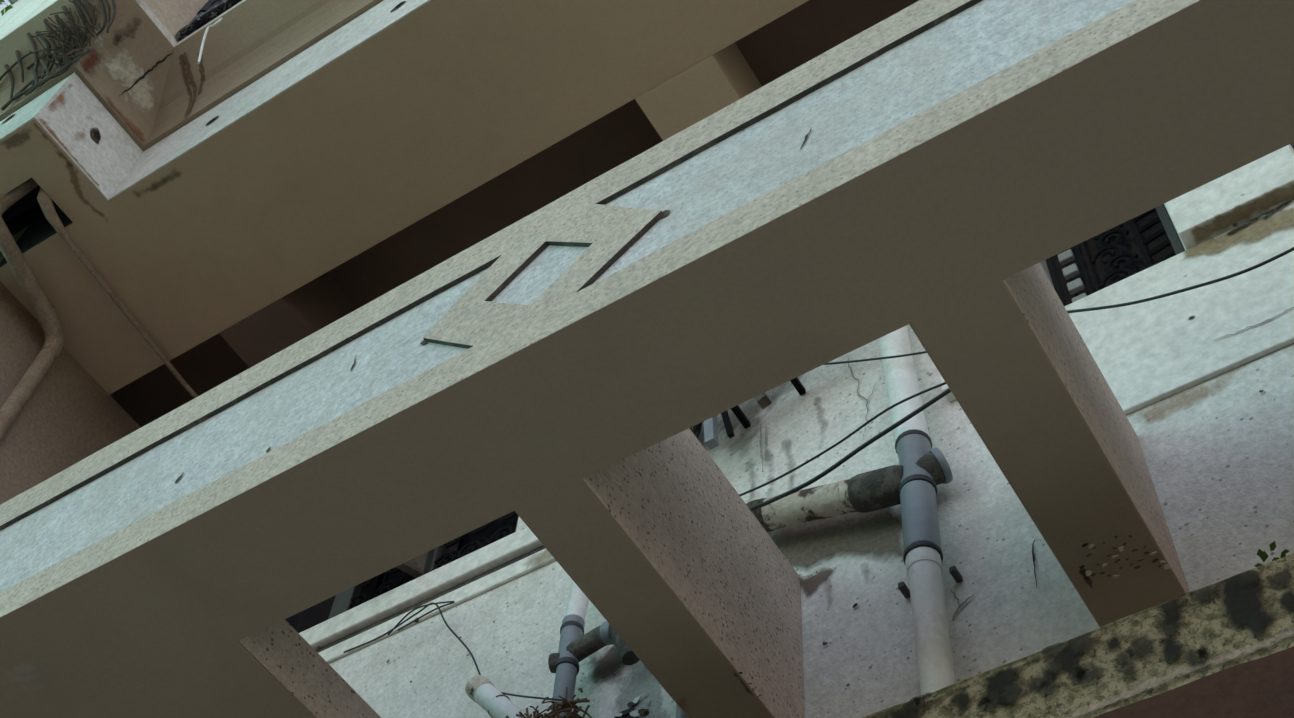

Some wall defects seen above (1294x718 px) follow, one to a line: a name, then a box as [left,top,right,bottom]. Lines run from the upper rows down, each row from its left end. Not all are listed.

crack [119,52,173,96]
rust [35,119,99,185]
leakage [1185,184,1294,257]
leakage [767,507,902,596]
spalling [1079,535,1170,588]
leakage [1070,630,1294,718]